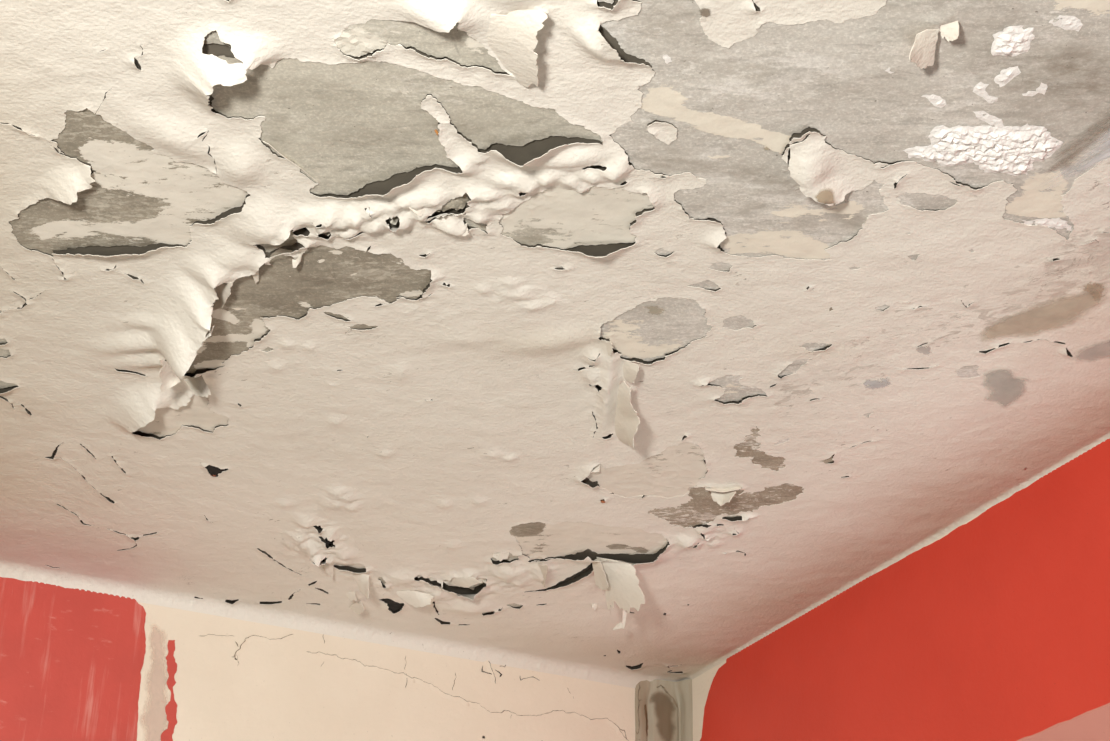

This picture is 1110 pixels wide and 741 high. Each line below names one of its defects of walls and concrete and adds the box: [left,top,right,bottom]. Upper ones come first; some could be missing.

peeling [0,108,431,442]
peeling [152,0,1110,449]
peeling [293,442,804,630]
peeling [734,426,786,471]
crack [189,546,677,741]
damp [652,693,673,741]